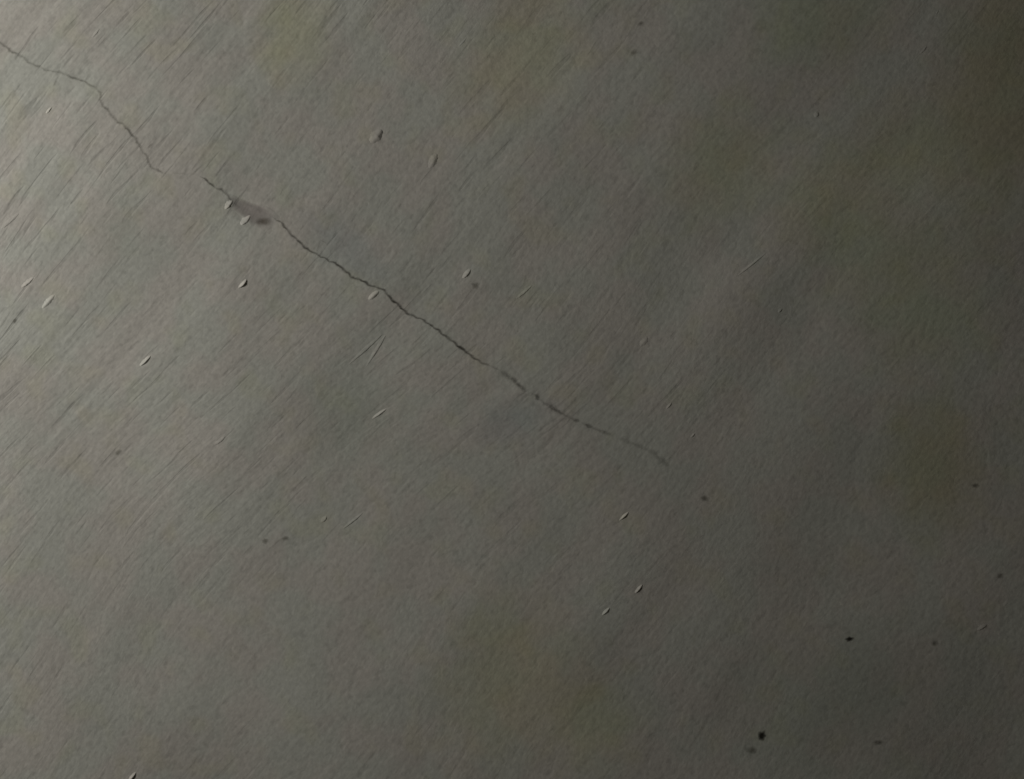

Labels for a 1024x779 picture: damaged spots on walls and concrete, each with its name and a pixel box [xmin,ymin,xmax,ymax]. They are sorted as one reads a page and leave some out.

crack [334,262,466,353]